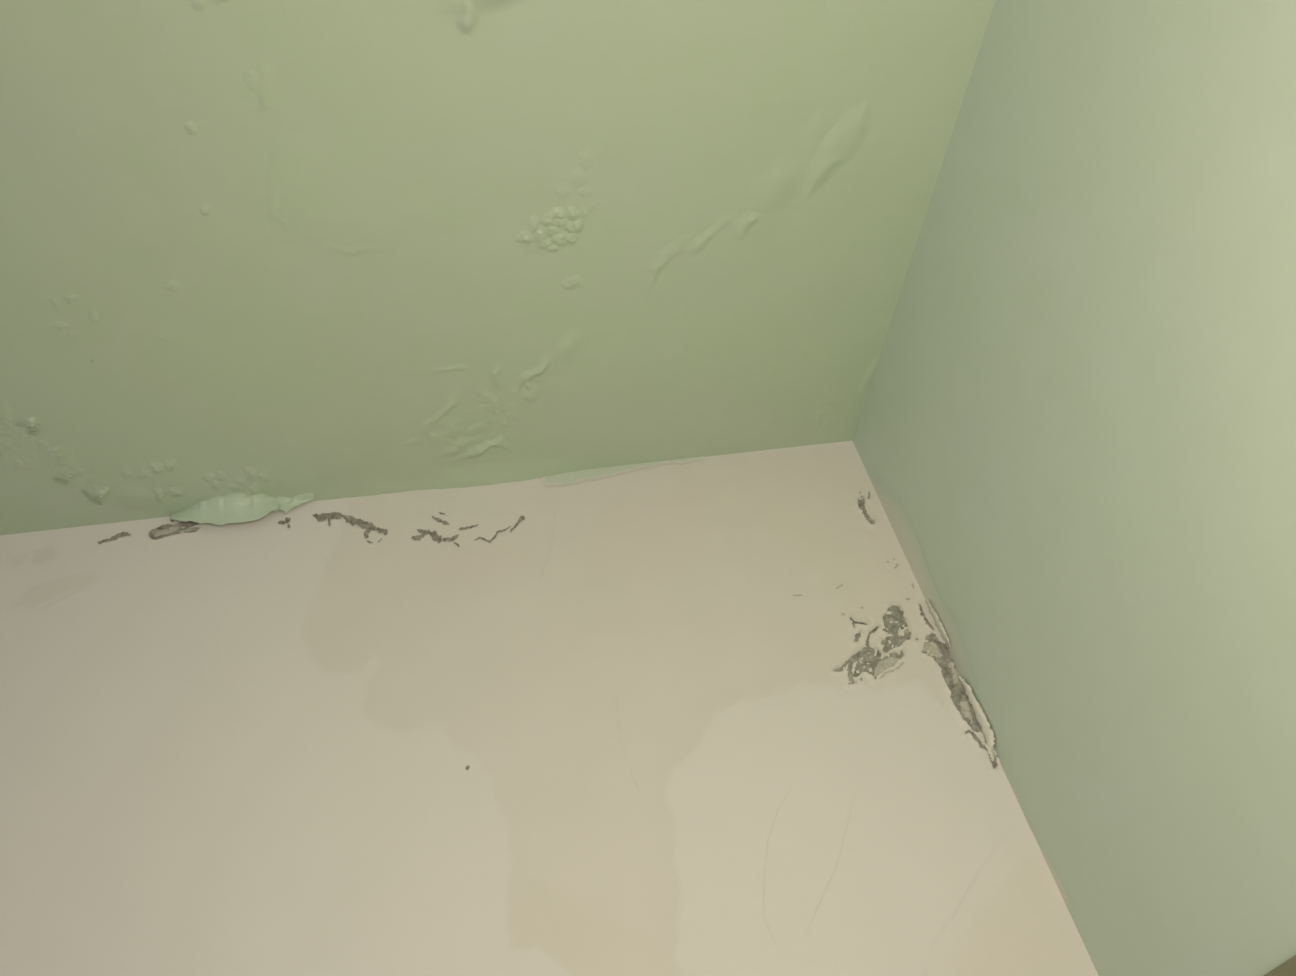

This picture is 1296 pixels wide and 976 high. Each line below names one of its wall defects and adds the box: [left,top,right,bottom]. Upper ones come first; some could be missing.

peeling [142,492,314,545]
spalling [829,471,1073,909]